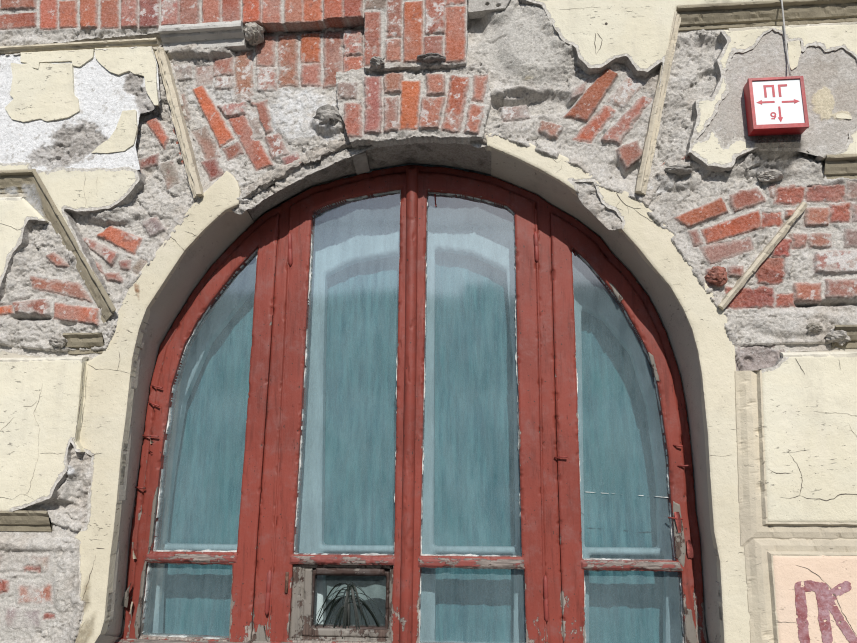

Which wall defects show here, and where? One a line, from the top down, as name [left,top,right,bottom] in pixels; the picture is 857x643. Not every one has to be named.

spalling [0,0,857,371]
crack [74,354,127,441]
peeling [648,352,659,381]
crack [772,450,857,501]
spalling [0,443,93,643]
peeling [672,501,693,567]
peeling [684,607,698,643]